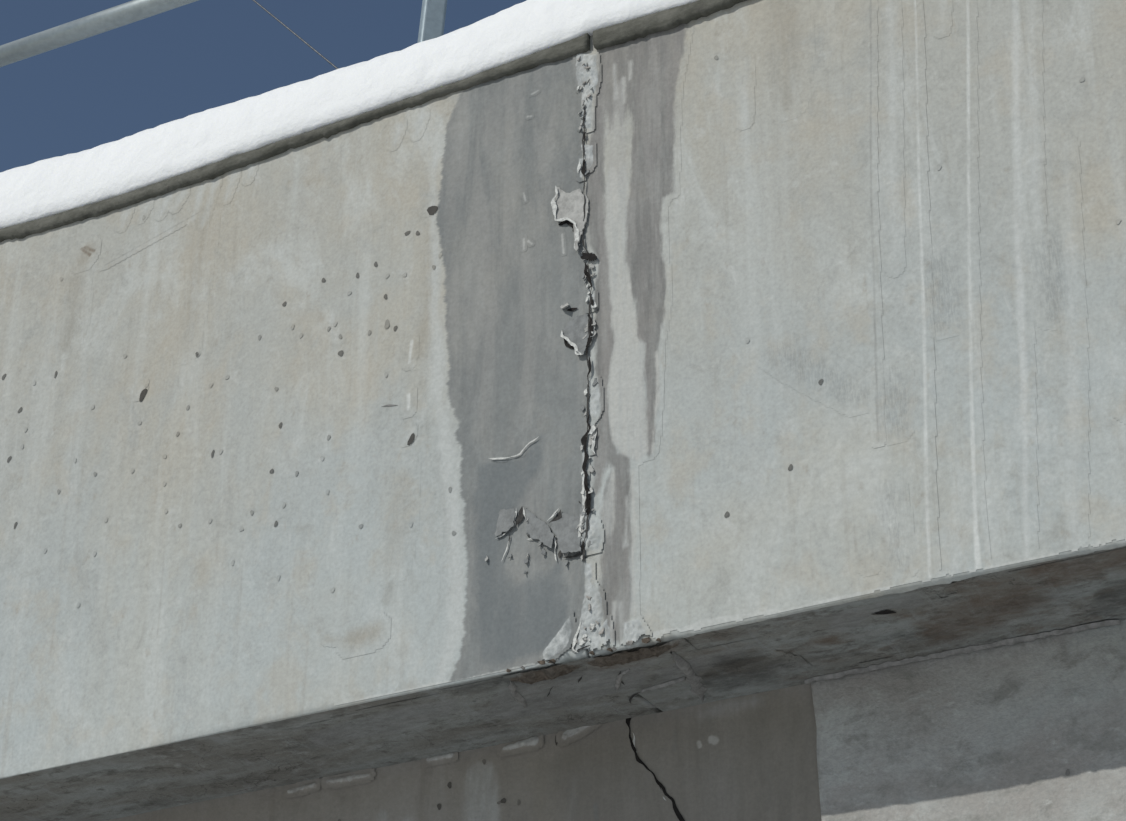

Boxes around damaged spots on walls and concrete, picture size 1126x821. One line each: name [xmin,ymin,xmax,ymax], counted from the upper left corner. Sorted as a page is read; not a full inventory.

water stain [374,20,696,700]
peeling [560,303,590,355]
crack [579,64,597,563]
peeling [485,501,583,574]
spalling [334,534,1126,706]
crack [618,671,685,821]